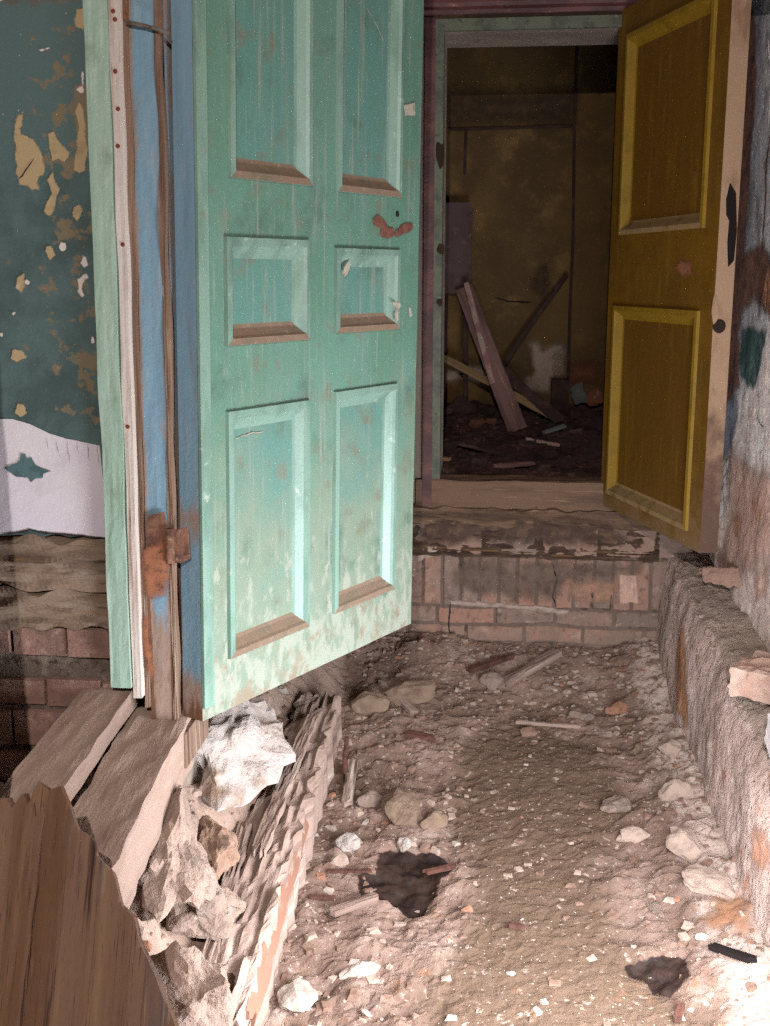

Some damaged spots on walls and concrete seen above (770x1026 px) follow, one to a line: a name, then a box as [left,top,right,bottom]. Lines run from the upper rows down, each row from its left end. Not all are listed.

peeling [74,9,84,30]
peeling [14,72,88,216]
peeling [72,205,83,221]
peeling [45,242,66,260]
peeling [16,274,30,293]
spalling [77,257,88,297]
peeling [11,349,26,362]
peeling [0,404,109,631]
corrosion [143,539,170,598]
corrosion [142,615,155,678]